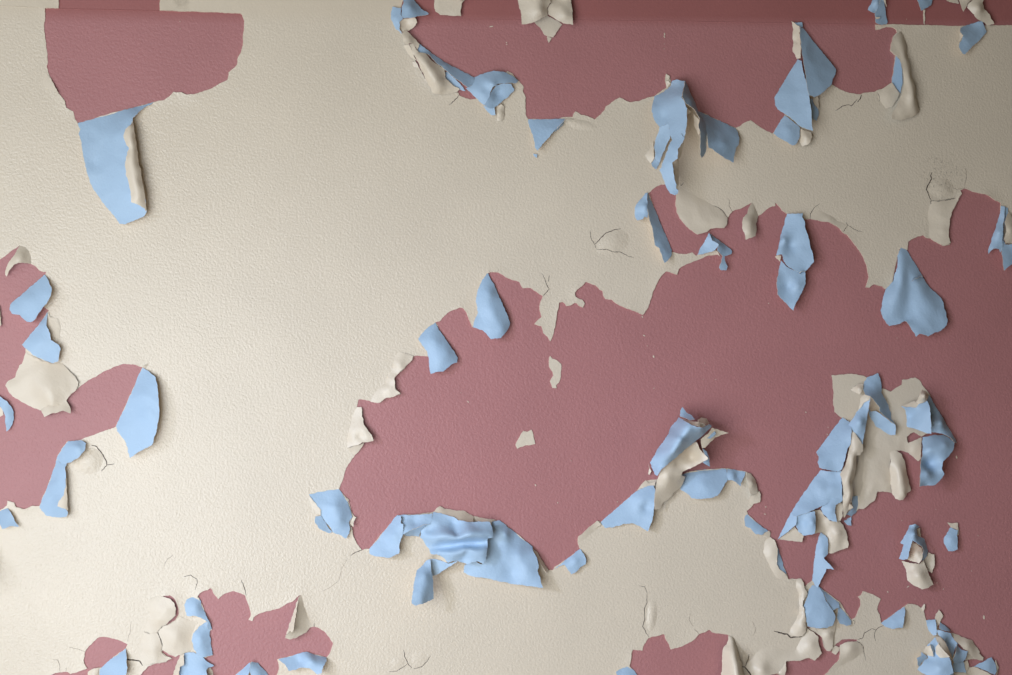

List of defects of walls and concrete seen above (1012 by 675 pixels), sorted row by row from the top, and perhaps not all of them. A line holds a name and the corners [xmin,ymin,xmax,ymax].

peeling [43,0,244,224]
peeling [0,246,160,529]
peeling [309,0,1012,675]
peeling [52,637,128,675]
peeling [140,588,333,675]